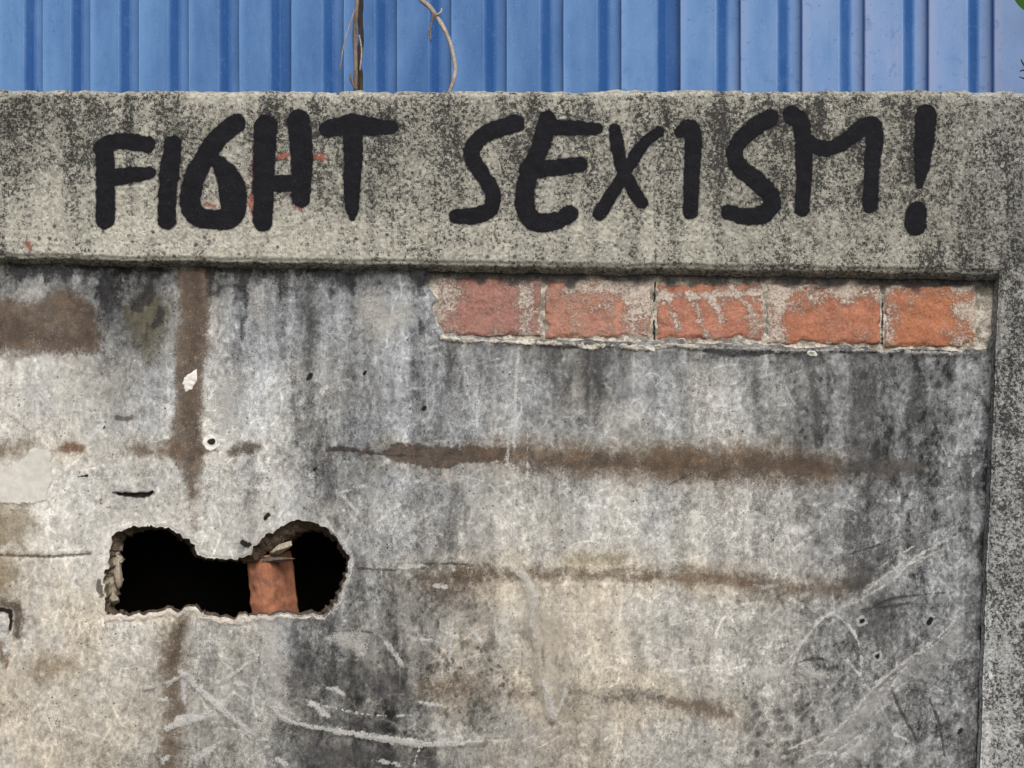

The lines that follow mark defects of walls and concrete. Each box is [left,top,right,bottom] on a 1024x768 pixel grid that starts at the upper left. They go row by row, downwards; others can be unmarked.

damp [290,269,355,422]
damp [444,345,456,388]
spalling [411,267,995,357]
damp [302,424,365,515]
damp [504,339,530,561]
rust [326,439,923,500]
damp [749,344,949,679]
spalling [96,512,354,624]
damp [263,618,483,768]
damp [470,628,512,697]
damp [777,576,981,768]